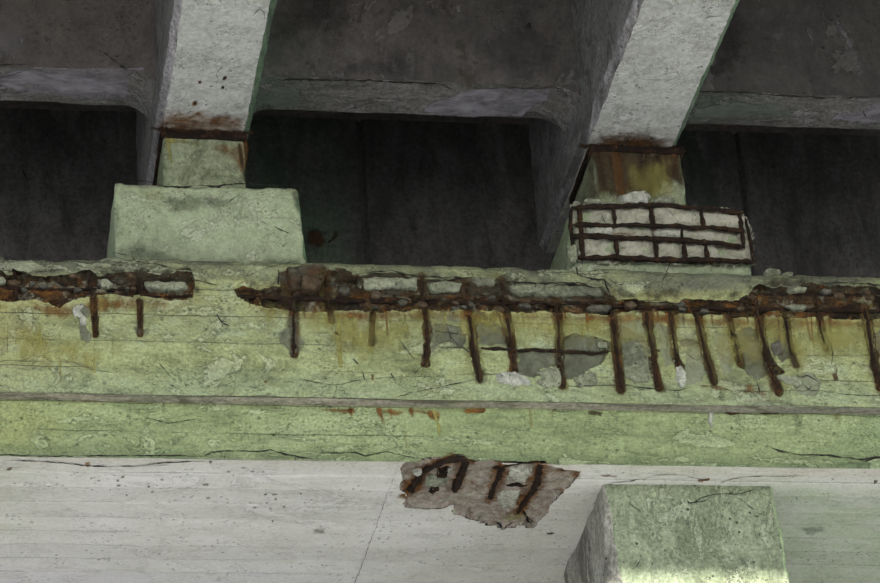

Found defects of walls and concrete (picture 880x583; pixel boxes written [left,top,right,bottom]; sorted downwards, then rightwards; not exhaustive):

rust [151,101,255,181]
rust [579,133,685,196]
spalling [0,262,199,342]
spalling [235,264,880,397]
crack [0,449,426,582]
spalling [399,454,581,530]
crack [681,475,788,509]
crack [773,448,880,462]